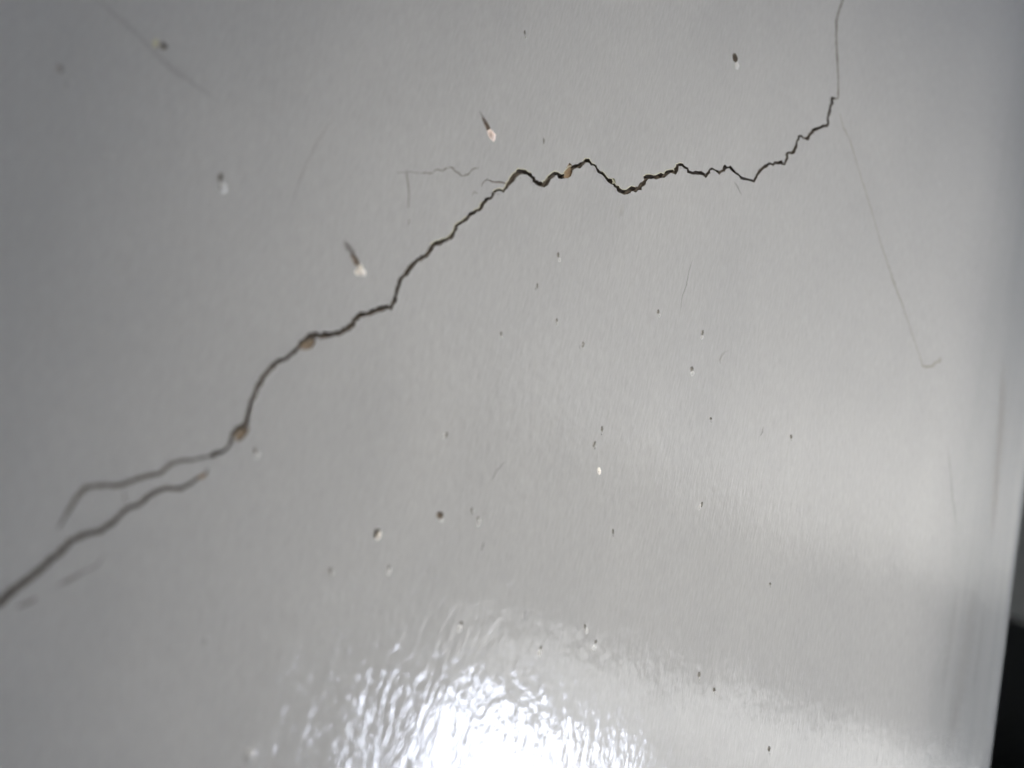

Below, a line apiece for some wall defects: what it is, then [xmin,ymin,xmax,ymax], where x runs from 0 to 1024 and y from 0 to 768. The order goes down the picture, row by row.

crack [0,0,941,607]